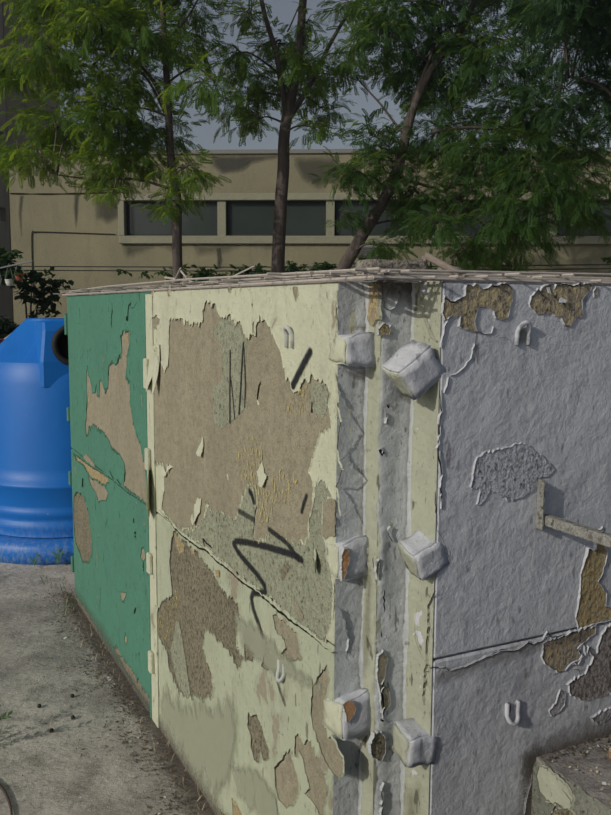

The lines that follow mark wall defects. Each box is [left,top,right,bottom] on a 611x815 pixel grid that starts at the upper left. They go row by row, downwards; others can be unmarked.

peeling [441,282,513,333]
peeling [528,282,598,328]
peeling [73,452,109,564]
peeling [85,299,350,705]
peeling [540,543,611,717]
peeling [247,664,345,815]
peeling [589,706,611,725]